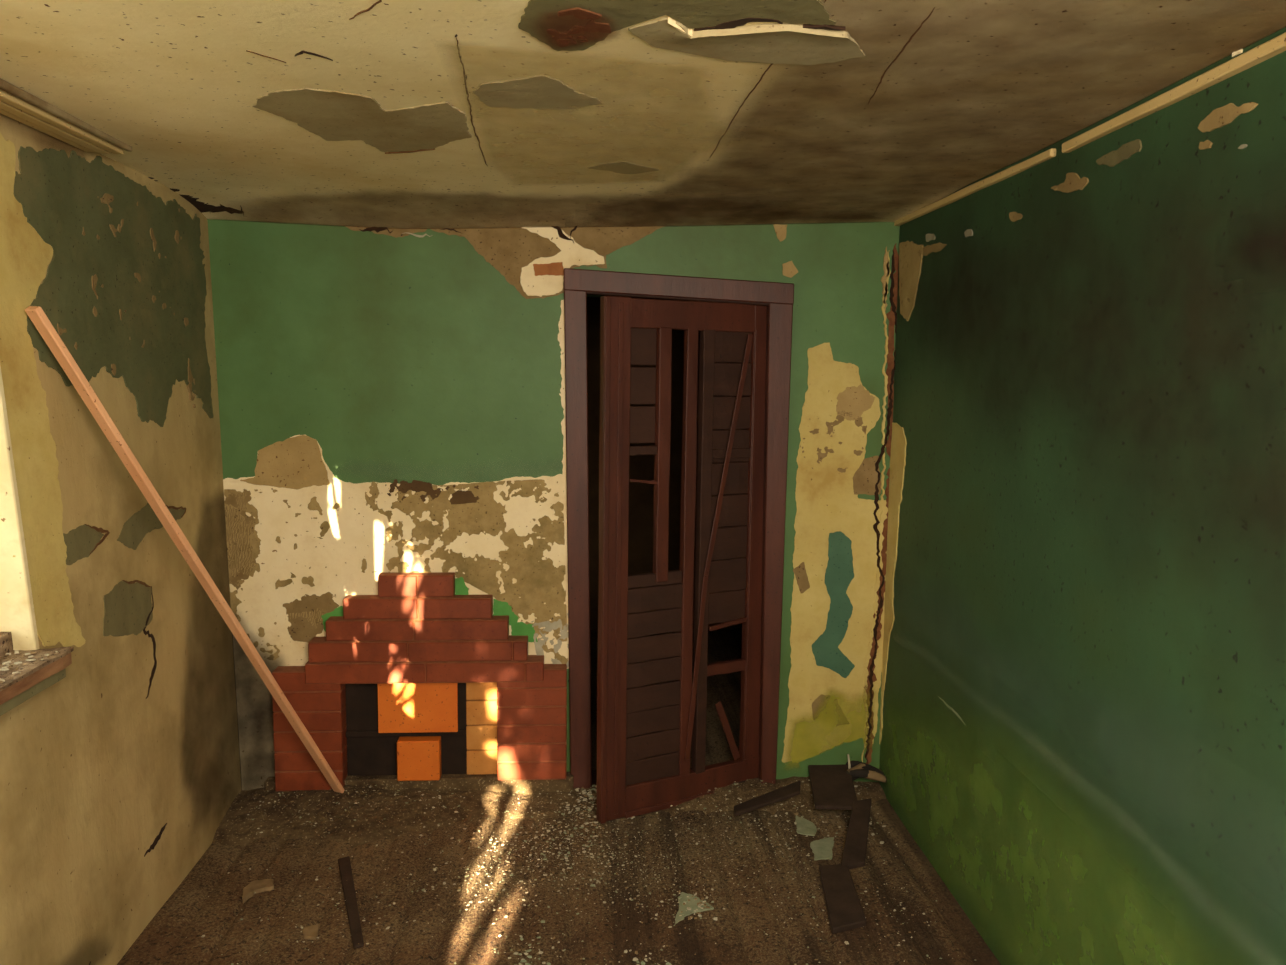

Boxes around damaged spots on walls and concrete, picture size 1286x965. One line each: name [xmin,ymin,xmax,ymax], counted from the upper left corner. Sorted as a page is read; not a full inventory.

crack [246,50,333,63]
crack [349,0,382,20]
peeling [518,0,865,65]
peeling [253,88,472,154]
peeling [473,75,601,110]
peeling [1198,102,1258,150]
peeling [1051,172,1089,193]
flaking render [899,233,947,321]
peeling [0,132,214,647]
peeling [223,226,665,669]
crack [861,243,899,764]
peeling [782,343,907,770]